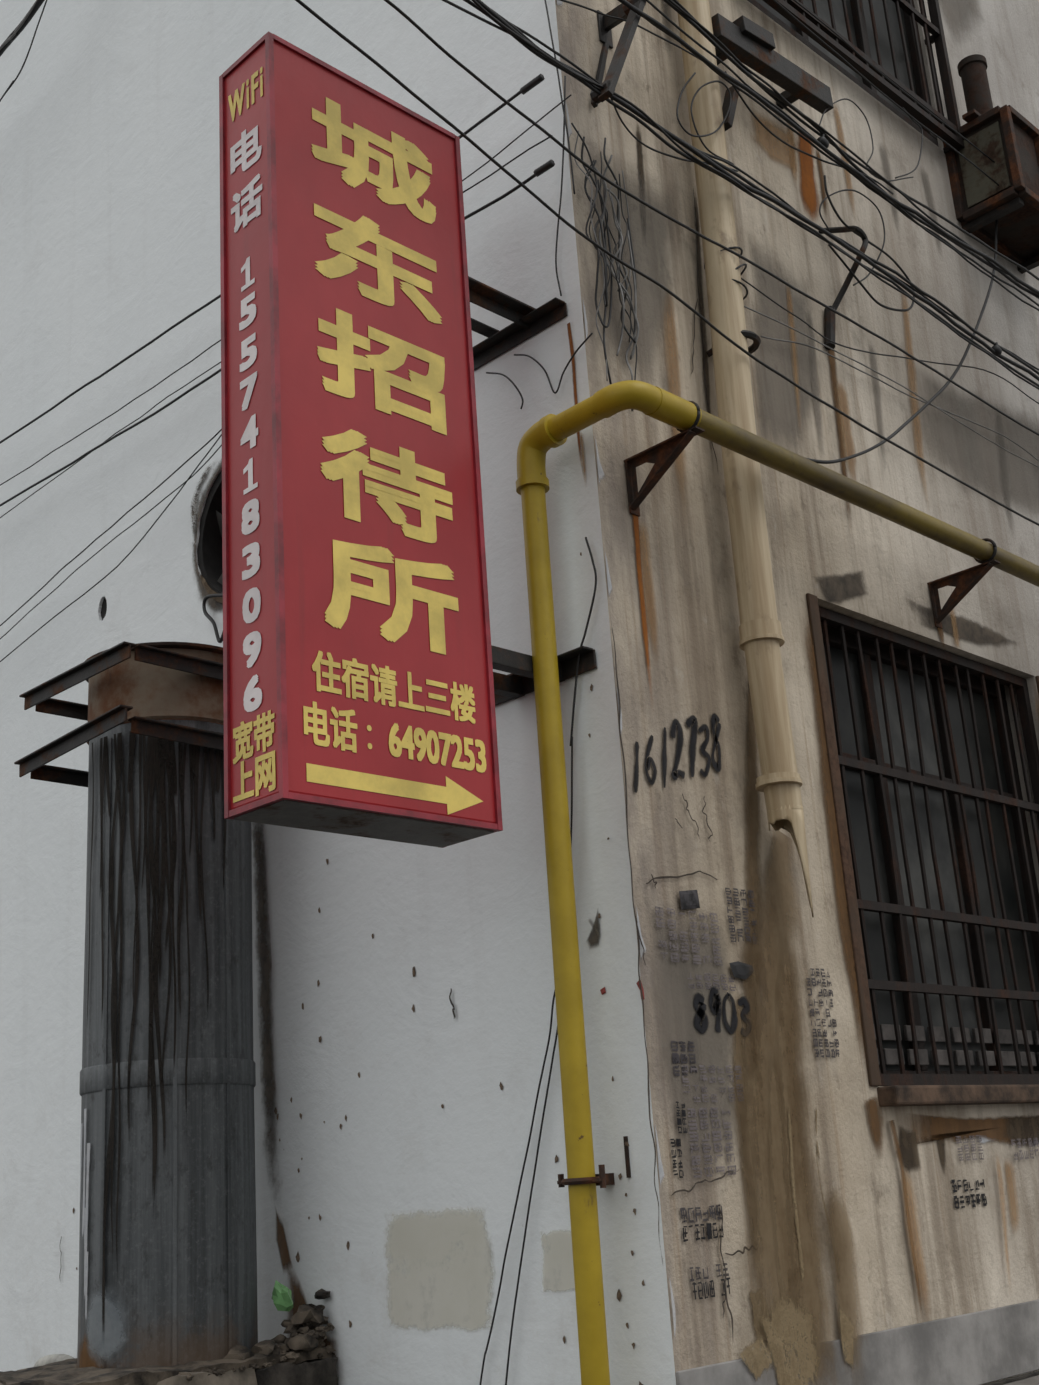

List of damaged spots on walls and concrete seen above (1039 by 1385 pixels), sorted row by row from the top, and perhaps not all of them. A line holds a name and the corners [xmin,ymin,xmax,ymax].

corrosion [755,115,826,216]
corrosion [633,515,656,676]
leakage [658,688,859,1385]